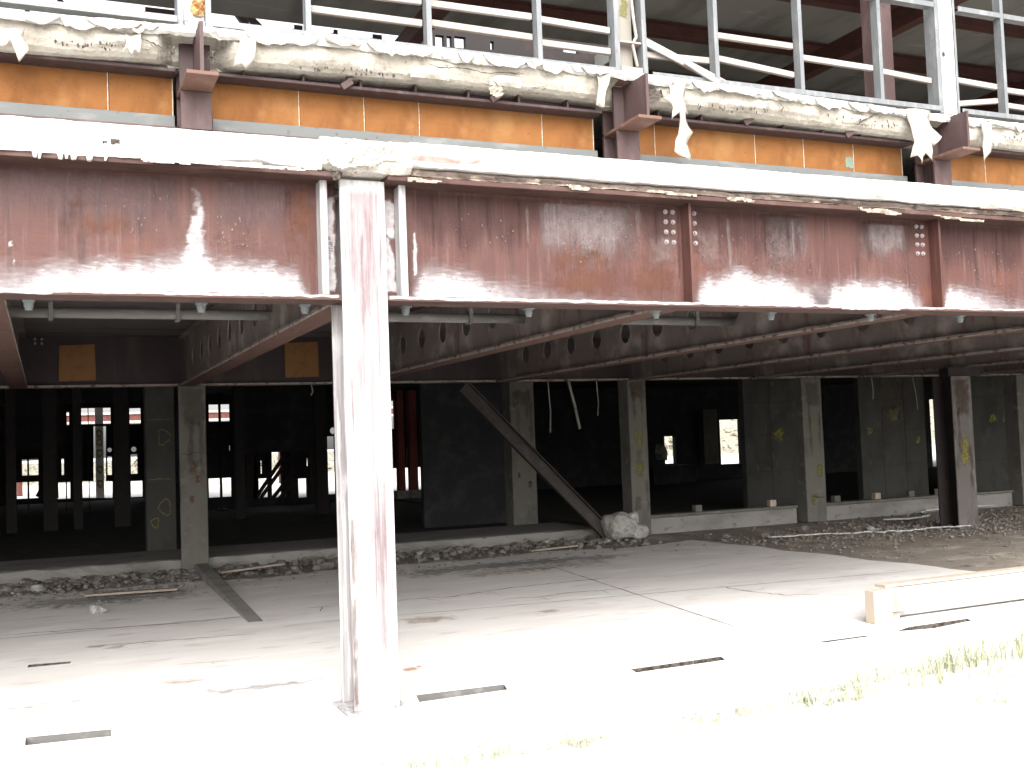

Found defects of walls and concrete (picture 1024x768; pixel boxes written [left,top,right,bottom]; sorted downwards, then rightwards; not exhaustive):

spalling [487,85,504,97]
spalling [141,149,317,171]
spalling [327,138,401,180]
water stain [0,198,339,298]
water stain [389,233,1024,311]